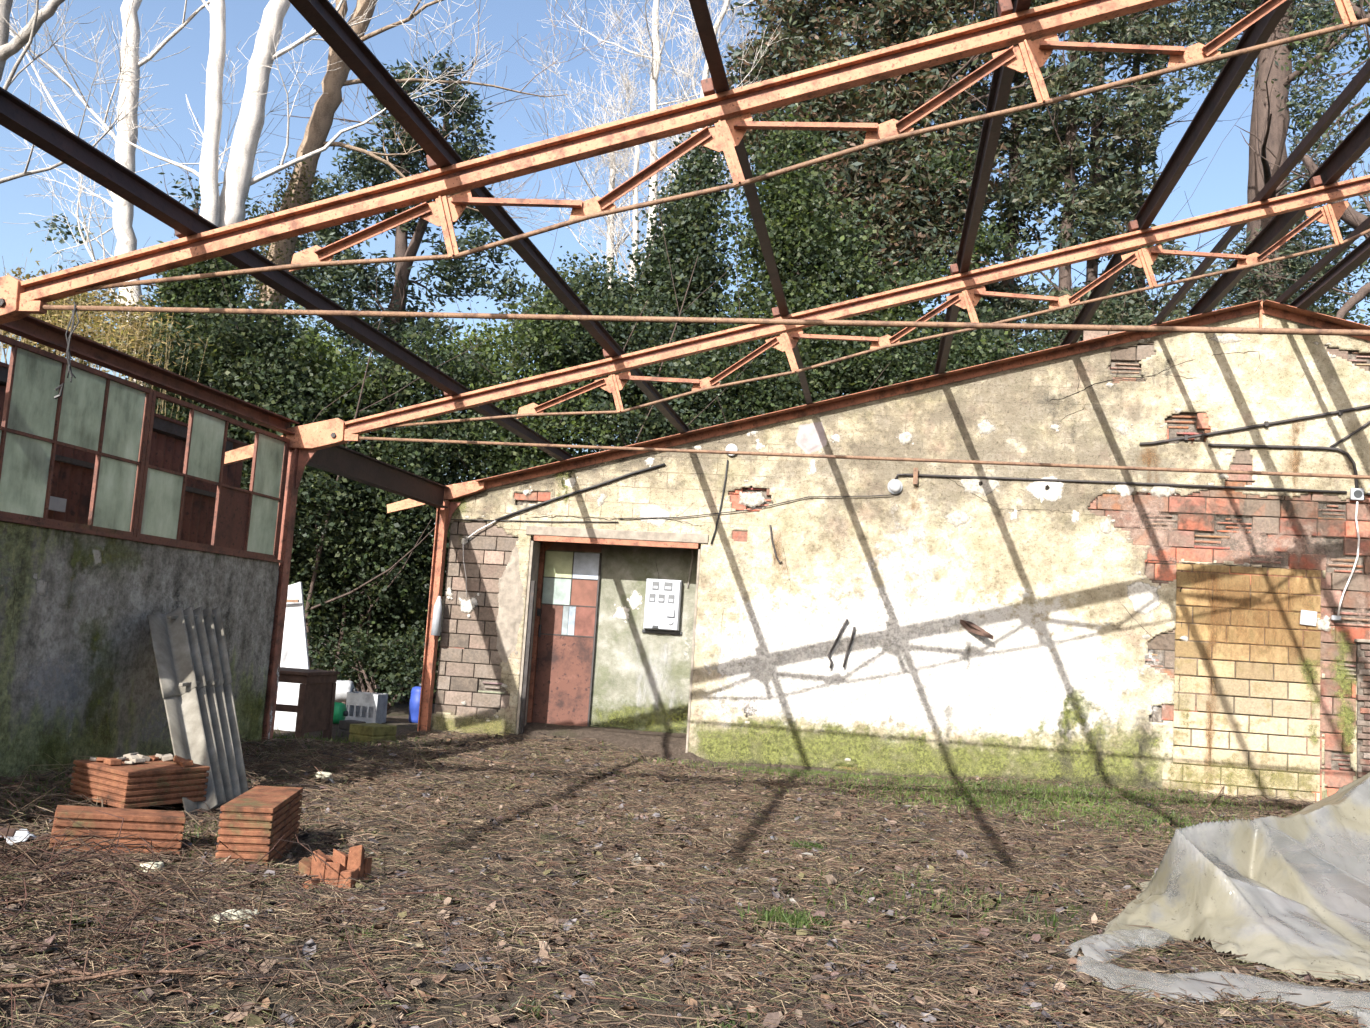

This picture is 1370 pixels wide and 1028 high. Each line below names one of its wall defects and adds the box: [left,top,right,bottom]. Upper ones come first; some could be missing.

spalling [1313,342,1370,371]
spalling [1159,408,1218,444]
spalling [434,515,520,722]